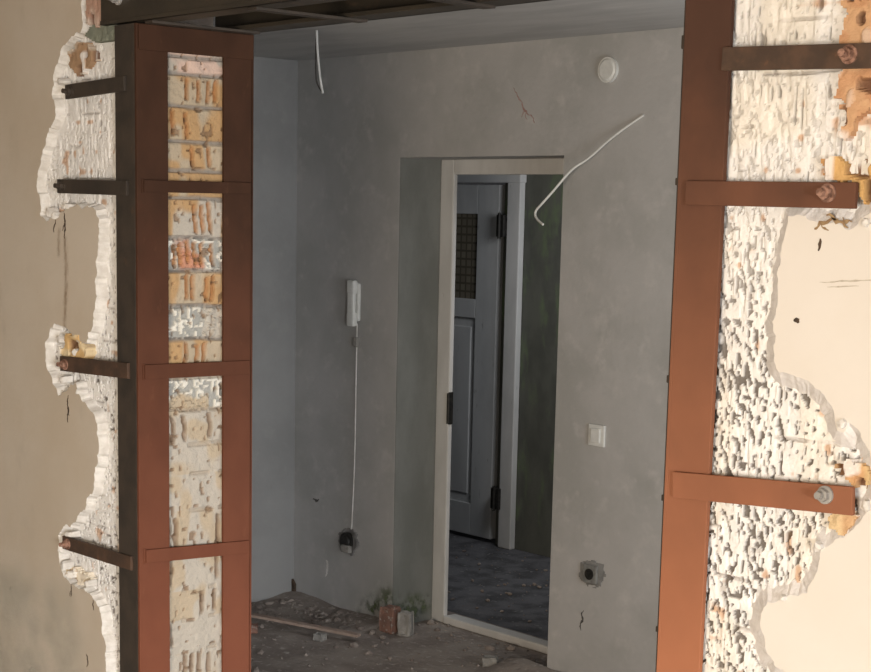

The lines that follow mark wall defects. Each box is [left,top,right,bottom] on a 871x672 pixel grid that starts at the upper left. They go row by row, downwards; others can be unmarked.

spalling [733,0,871,47]
spalling [726,69,871,231]
spalling [46,0,119,552]
spalling [702,206,871,672]
spalling [58,546,120,672]